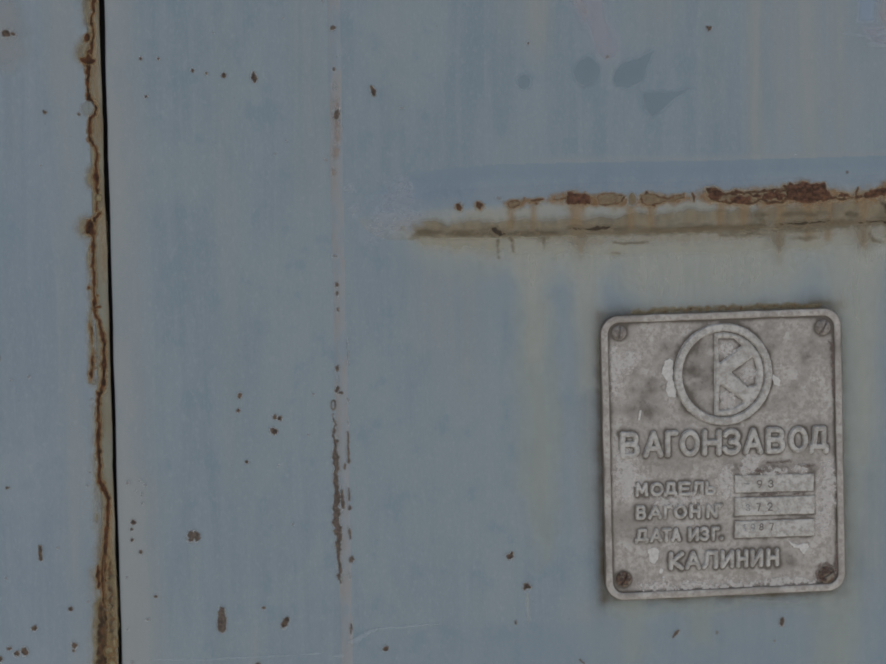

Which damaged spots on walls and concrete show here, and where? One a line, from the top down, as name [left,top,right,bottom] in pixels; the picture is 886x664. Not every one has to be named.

rust [399,181,886,255]
rust [330,383,355,584]
rust [187,530,201,542]
rust [93,512,117,664]
rust [217,607,227,633]